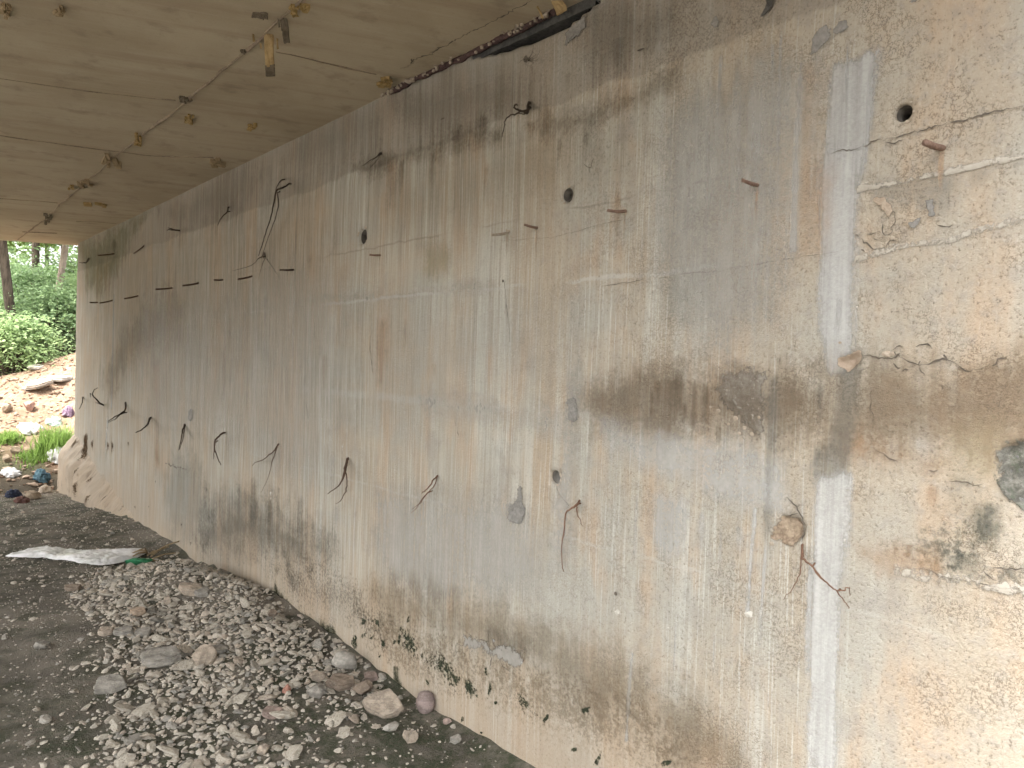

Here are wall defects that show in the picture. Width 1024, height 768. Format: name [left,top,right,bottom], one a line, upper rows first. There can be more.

crack [831,105,1023,154]
crack [862,343,1006,389]
crack [869,390,896,461]
spalling [994,440,1024,511]